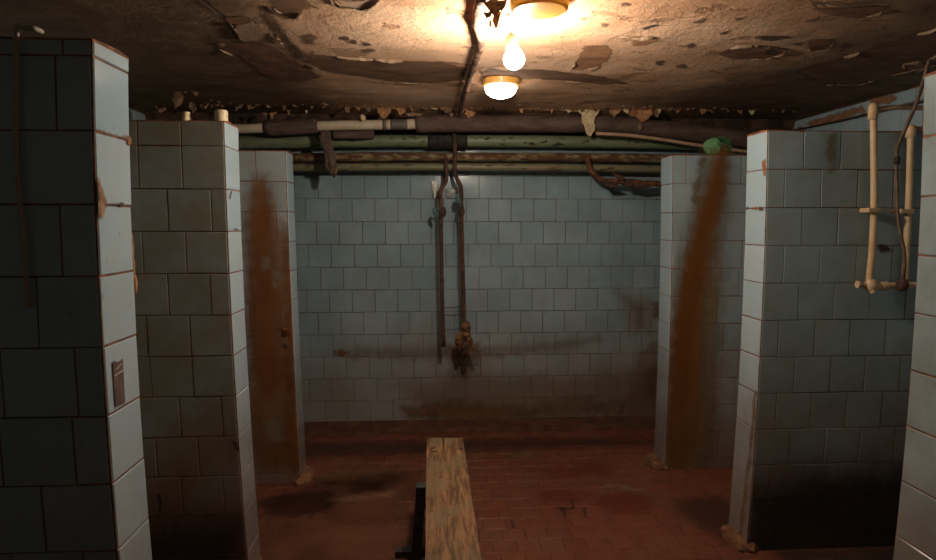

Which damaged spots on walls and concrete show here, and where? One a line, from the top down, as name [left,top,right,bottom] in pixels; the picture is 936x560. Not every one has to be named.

peeling [226,16,258,42]
peeling [264,0,627,84]
peeling [632,25,658,46]
peeling [719,36,836,60]
peeling [155,92,198,113]
peeling [377,107,424,118]
peeling [567,110,616,136]
peeling [628,109,659,130]
corrosion [249,181,298,467]
corrosion [670,158,726,469]